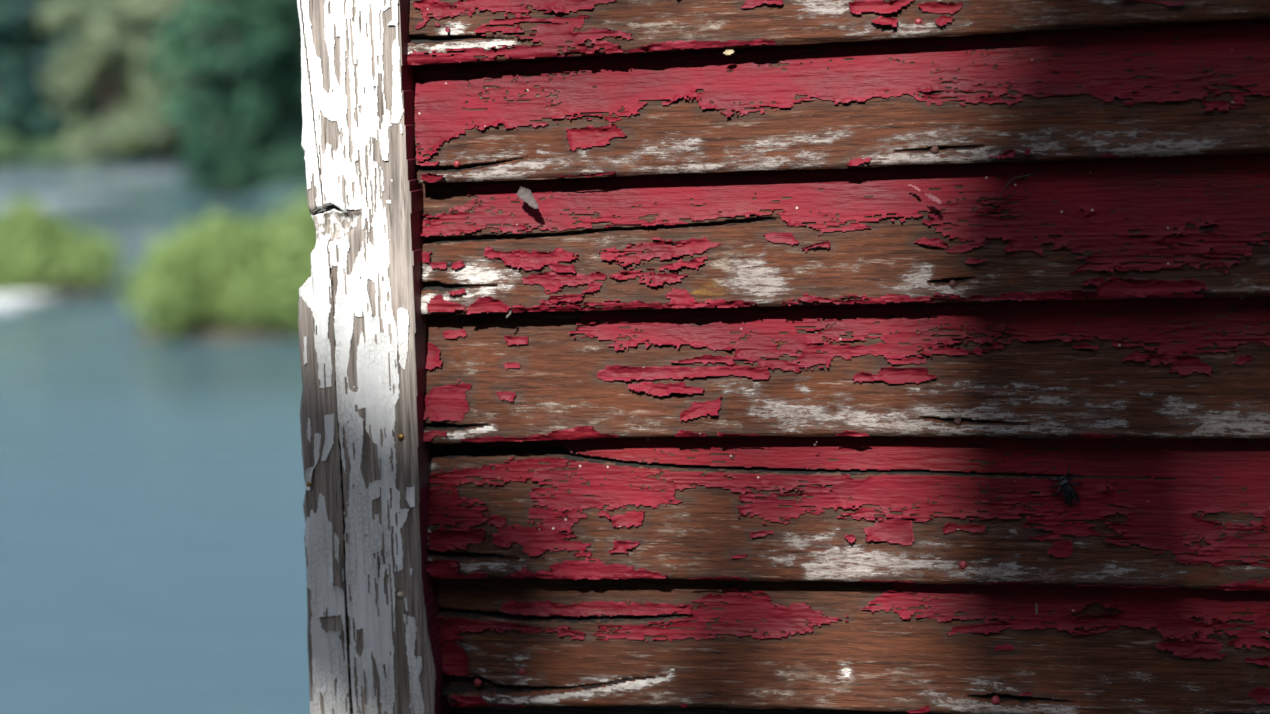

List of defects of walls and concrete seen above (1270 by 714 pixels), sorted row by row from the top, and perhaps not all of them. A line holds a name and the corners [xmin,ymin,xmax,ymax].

crack [442,674,668,695]
peeling [297,0,1270,714]